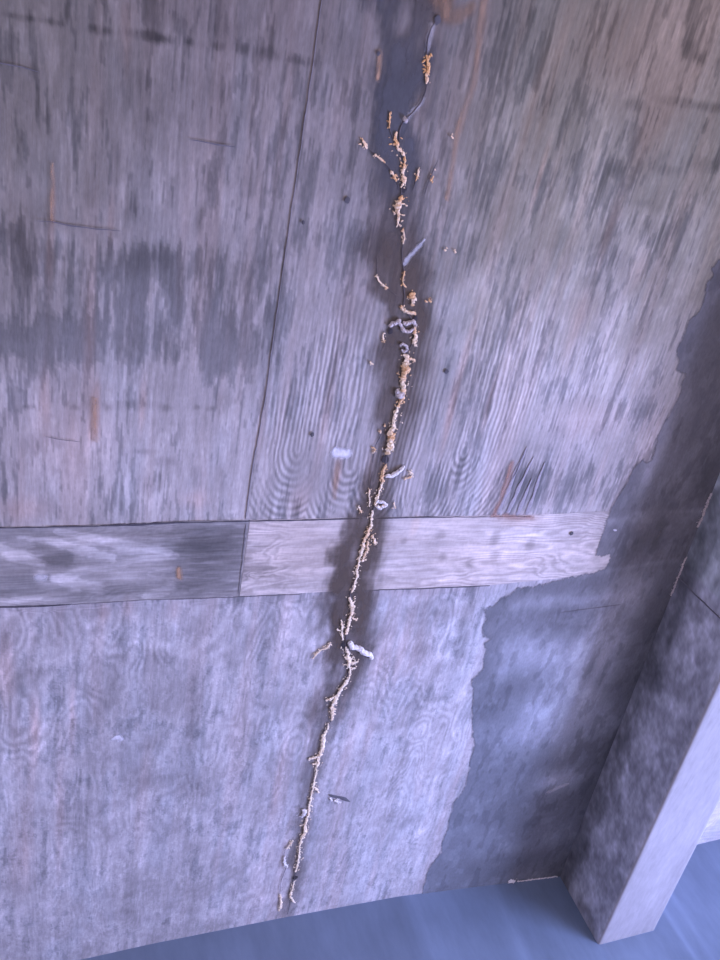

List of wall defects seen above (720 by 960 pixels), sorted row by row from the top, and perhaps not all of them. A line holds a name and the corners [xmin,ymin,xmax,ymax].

crack [368,20,438,196]
crack [376,224,418,363]
crack [364,426,392,543]
peeling [496,447,545,515]
crack [312,573,356,680]